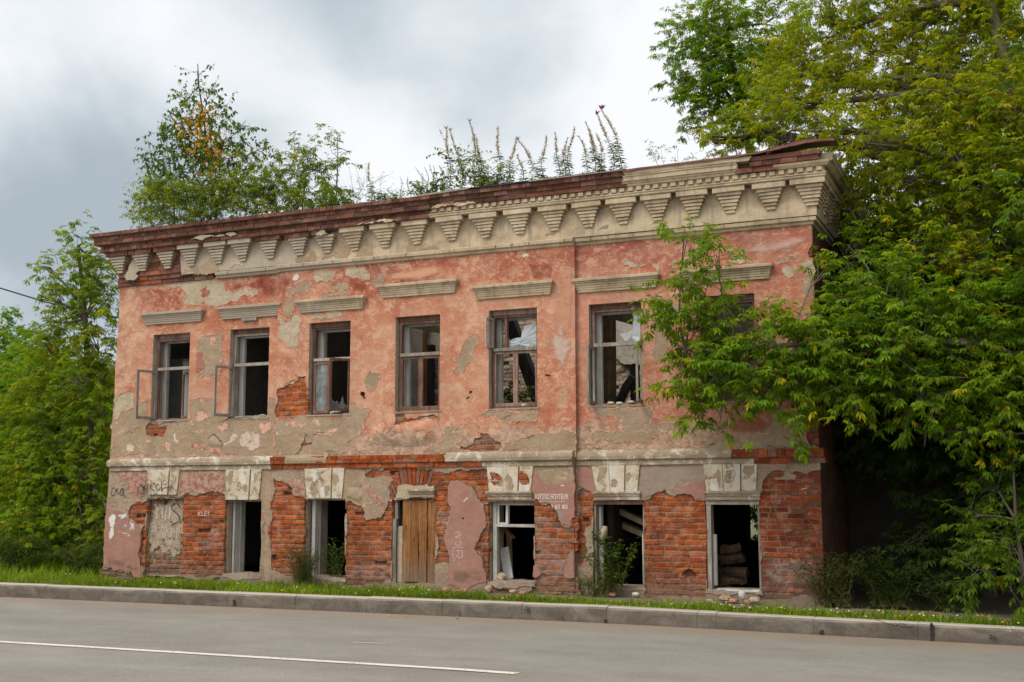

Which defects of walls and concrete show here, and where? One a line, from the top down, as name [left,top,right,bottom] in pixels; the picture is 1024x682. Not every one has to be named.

flaking render [89,171,627,349]
peeling [196,331,224,378]
peeling [452,333,479,374]
peeling [101,370,594,596]
flaking render [642,490,708,598]
flaking render [703,402,828,601]